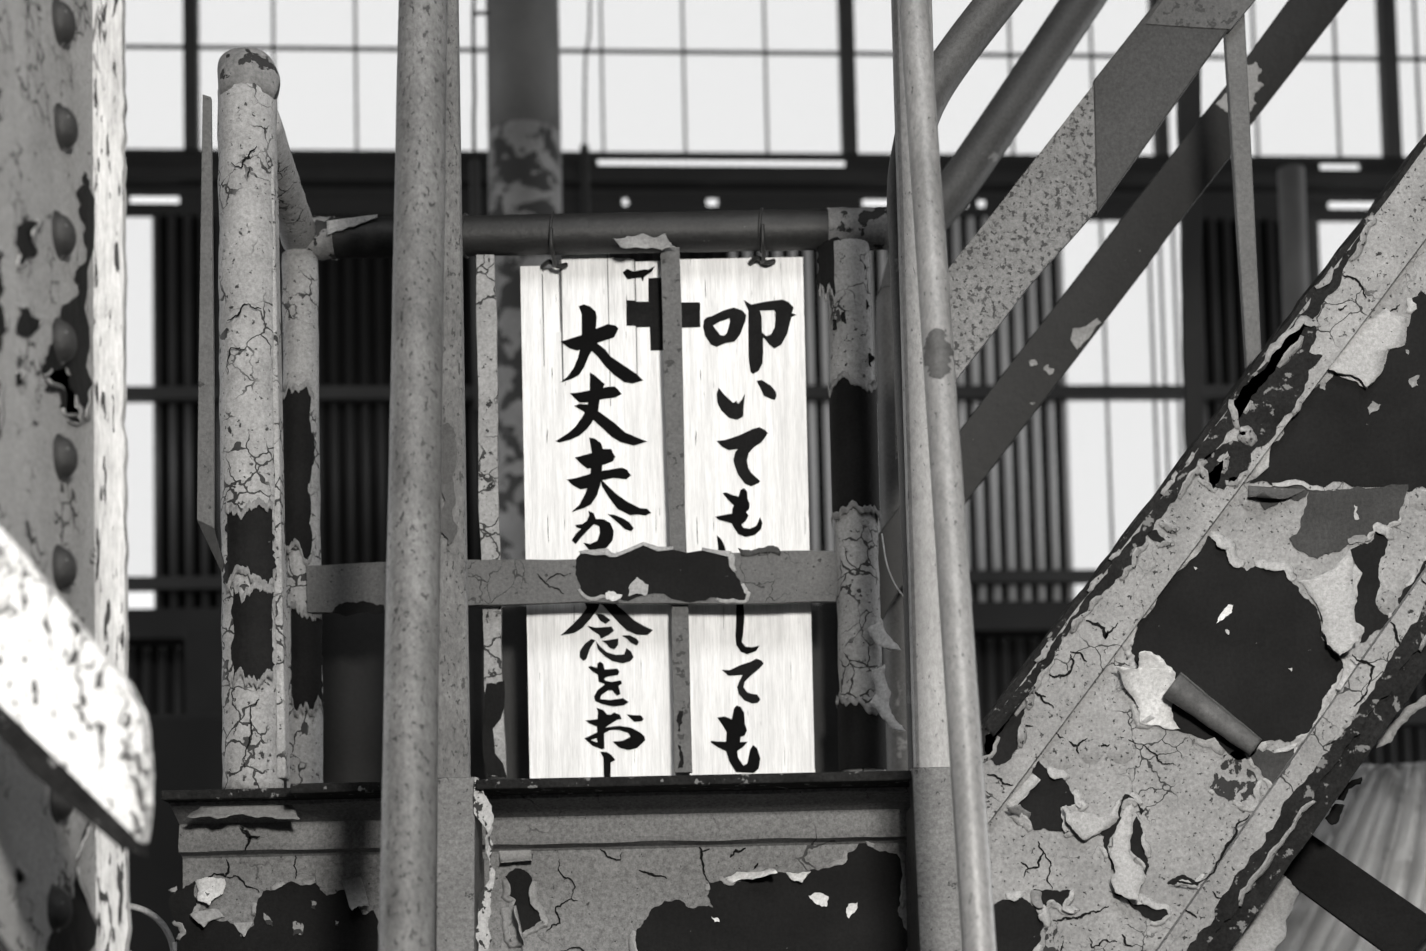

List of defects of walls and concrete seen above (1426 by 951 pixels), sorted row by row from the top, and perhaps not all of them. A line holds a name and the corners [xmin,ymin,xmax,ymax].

crack [231,146,257,177]
peeling [0,171,95,439]
peeling [223,379,385,718]
peeling [575,542,781,604]
peeling [1115,291,1426,812]
crack [1025,620,1176,766]
peeling [168,876,379,951]
crack [547,859,584,951]
crack [699,847,758,882]
peeling [628,841,908,951]
crack [1021,841,1133,951]
crack [1173,814,1250,918]